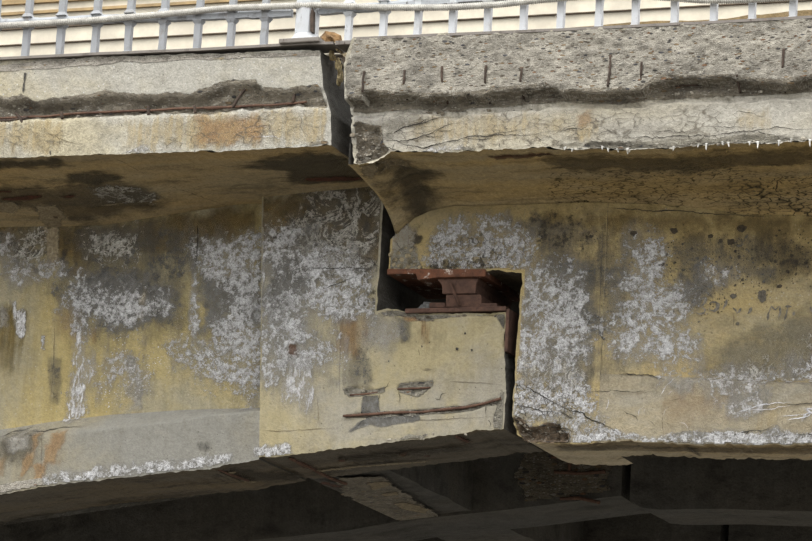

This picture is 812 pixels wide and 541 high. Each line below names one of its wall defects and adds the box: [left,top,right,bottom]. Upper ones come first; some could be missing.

peeling [0,52,319,71]
spalling [0,79,327,123]
spalling [336,19,812,179]
crack [385,107,809,150]
crack [543,163,812,217]
damp [0,186,409,422]
damp [392,210,812,443]
spalling [343,380,504,432]
crack [730,403,812,438]
damp [10,435,27,452]
damp [254,443,292,457]